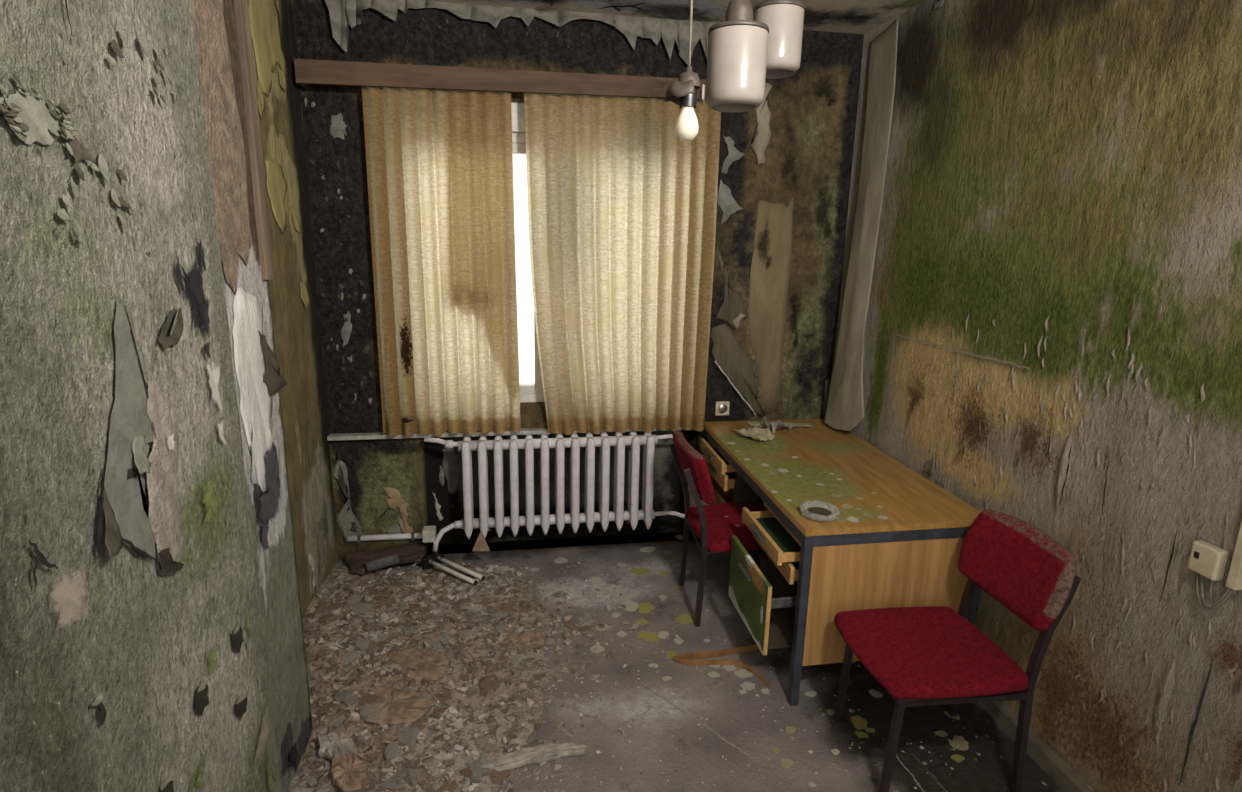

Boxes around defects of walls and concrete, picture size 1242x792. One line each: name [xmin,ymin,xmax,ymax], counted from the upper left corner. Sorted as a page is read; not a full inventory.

flaking render [107,28,181,104]
peeling [316,113,351,142]
flaking render [192,0,288,493]
peeling [265,159,301,234]
water stain [758,230,771,267]
water stain [817,188,832,238]
flaking render [300,268,373,409]
water stain [790,295,801,348]
flaking render [95,299,184,573]
flaking render [50,570,85,630]